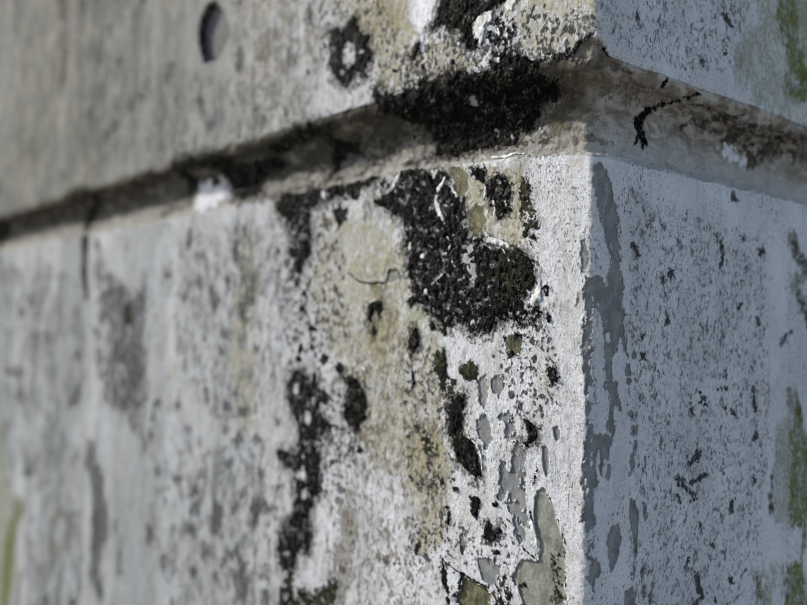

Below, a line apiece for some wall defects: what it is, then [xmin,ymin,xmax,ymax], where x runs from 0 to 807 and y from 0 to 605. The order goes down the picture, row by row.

water stain [689,102,807,166]
water stain [0,0,606,605]
water stain [788,230,807,330]
peeling [580,161,638,599]
peeling [453,374,567,605]
peeling [629,498,648,559]
peeling [624,566,652,605]